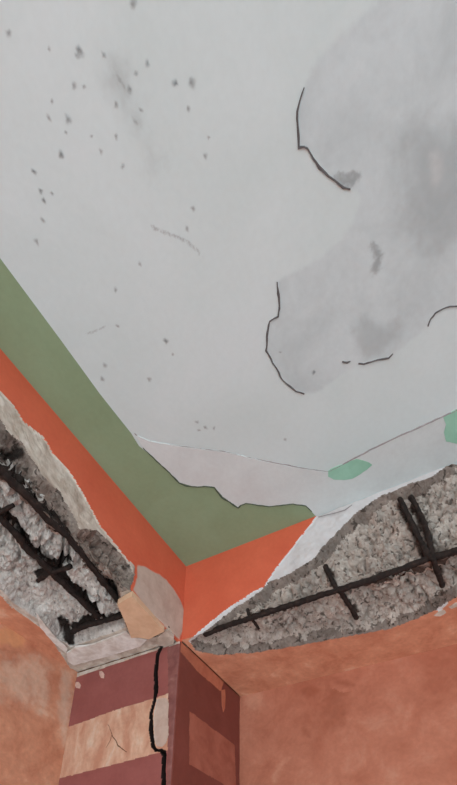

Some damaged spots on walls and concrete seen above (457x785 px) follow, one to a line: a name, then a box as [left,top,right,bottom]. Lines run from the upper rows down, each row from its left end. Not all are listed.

spalling [0,391,457,678]
crack [149,626,170,785]